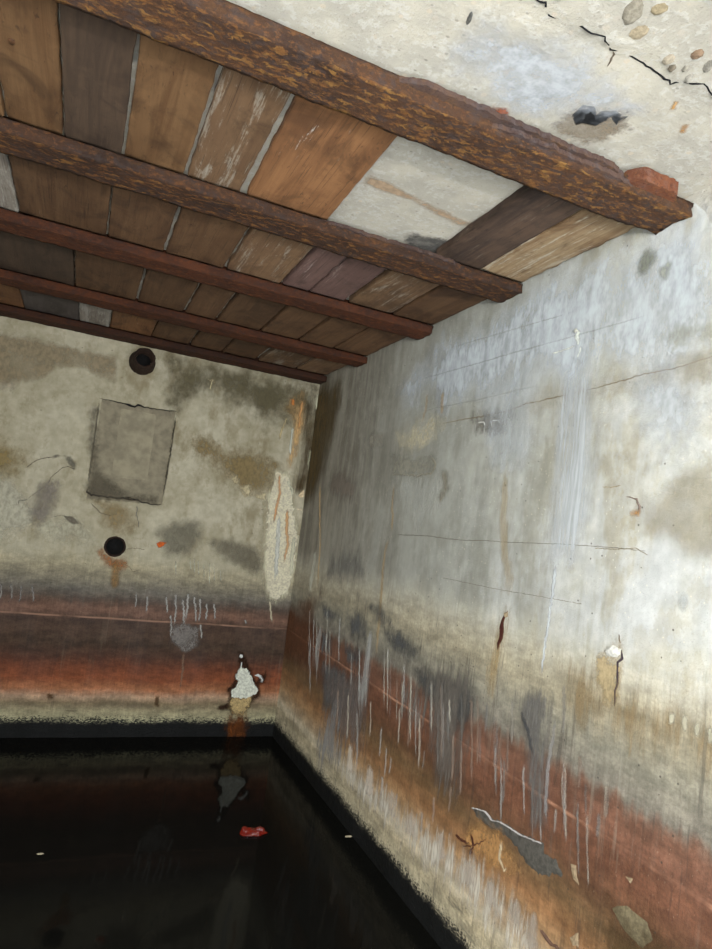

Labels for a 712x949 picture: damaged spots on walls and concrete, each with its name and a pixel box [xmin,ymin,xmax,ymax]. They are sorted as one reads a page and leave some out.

crack [580,26,712,98]
spalling [556,105,628,143]
water stain [0,336,115,382]
water stain [170,358,340,620]
water stain [164,524,198,571]
water stain [166,594,216,651]
water stain [285,602,316,656]
rust [491,611,508,676]
rust [456,834,485,855]
peeling [466,807,579,885]
peeling [612,905,653,948]